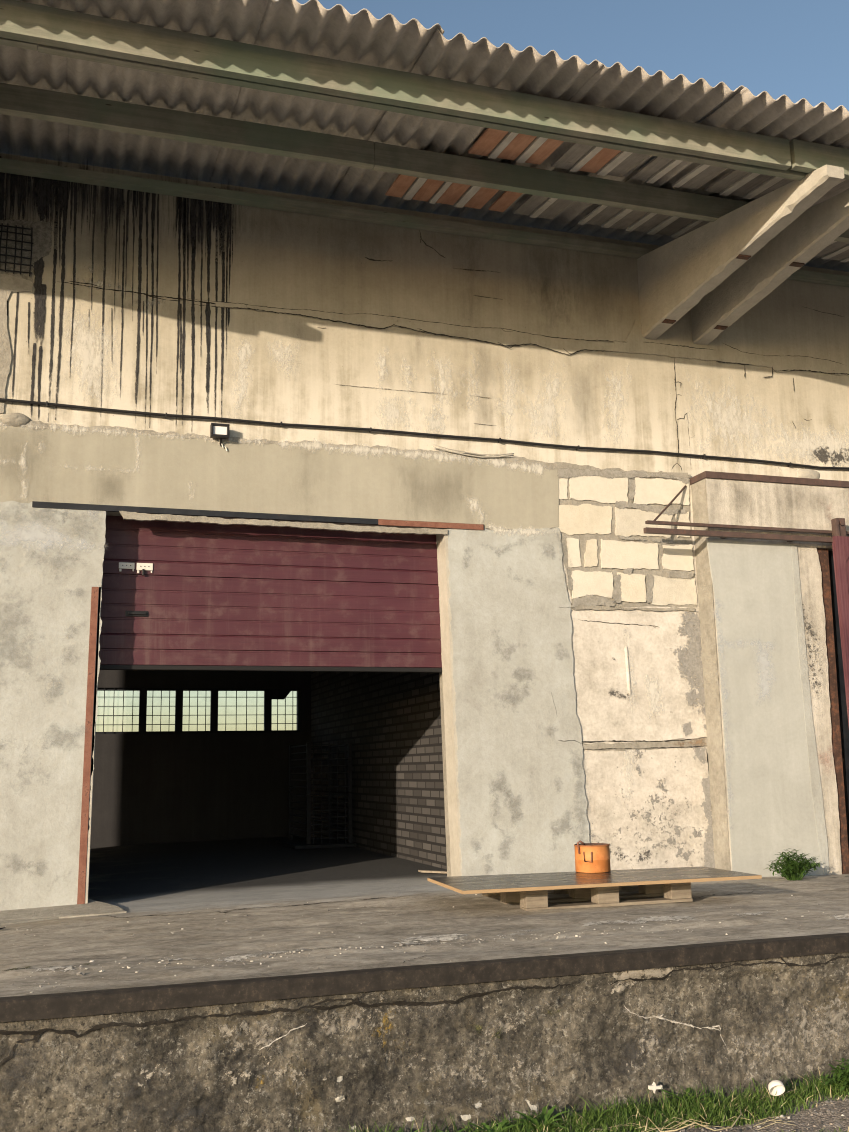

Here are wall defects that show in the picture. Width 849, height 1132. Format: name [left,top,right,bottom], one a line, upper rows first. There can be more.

water stain [0,172,159,428]
crack [63,281,619,355]
crack [336,384,441,394]
crack [647,342,849,470]